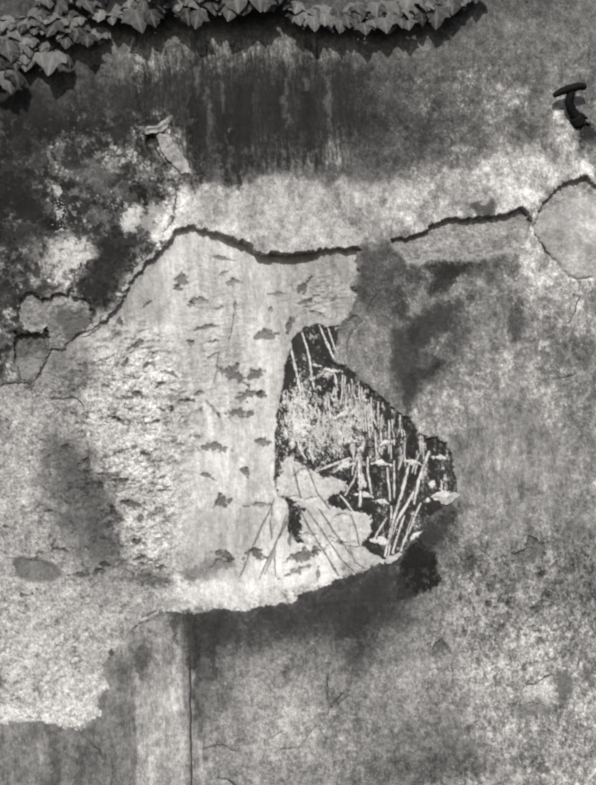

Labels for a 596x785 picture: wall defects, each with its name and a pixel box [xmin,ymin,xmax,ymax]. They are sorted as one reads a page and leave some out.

damp [64,41,391,193]
damp [391,260,474,404]
damp [507,300,524,342]
crack [524,213,588,323]
spalling [0,225,461,731]